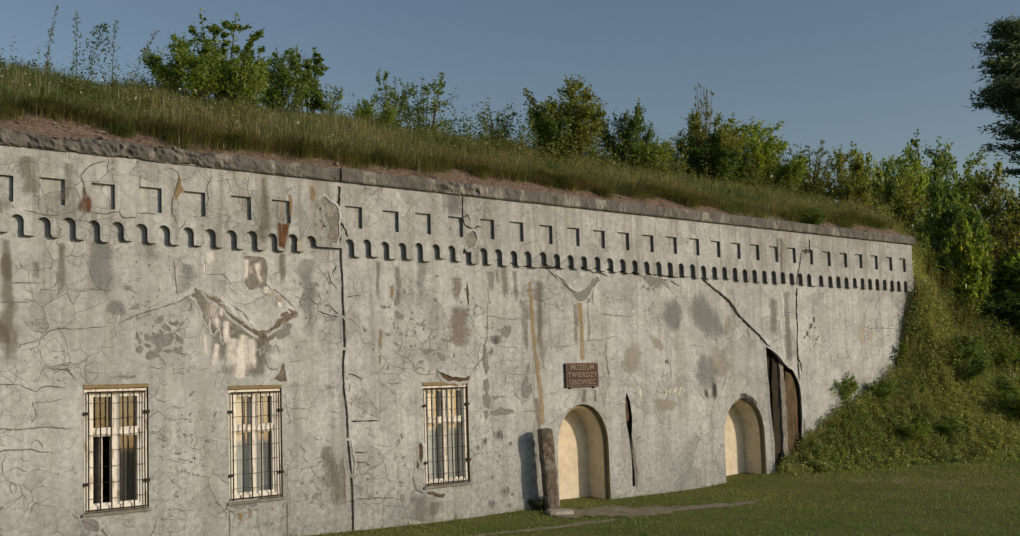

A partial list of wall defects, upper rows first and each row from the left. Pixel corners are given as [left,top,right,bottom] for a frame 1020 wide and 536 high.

corrosion [278,196,292,248]
leakage [0,246,15,353]
crack [14,261,249,349]
peeling [120,304,187,375]
spalling [188,252,358,356]
spalling [270,359,290,385]
crack [287,186,437,532]
leakage [526,282,544,424]
crack [496,239,810,380]
leakage [666,302,680,327]
leakage [694,304,729,333]
crack [0,368,74,494]